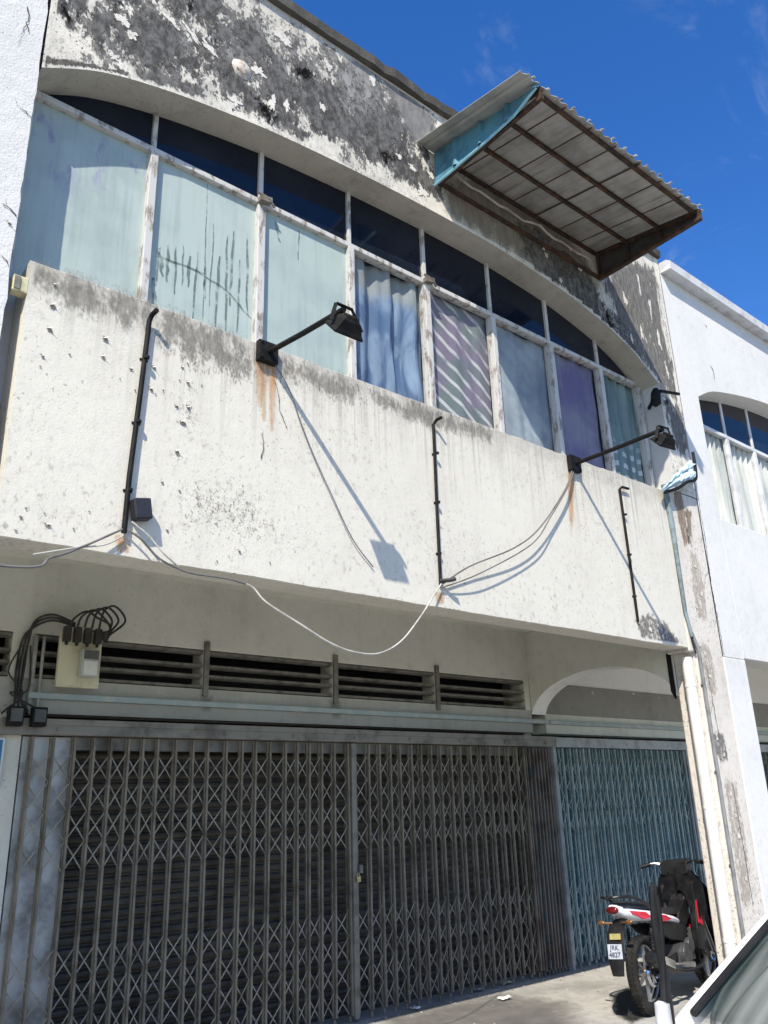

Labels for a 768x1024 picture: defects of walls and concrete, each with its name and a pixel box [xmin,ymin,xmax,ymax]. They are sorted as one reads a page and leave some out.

damp [45,0,689,456]